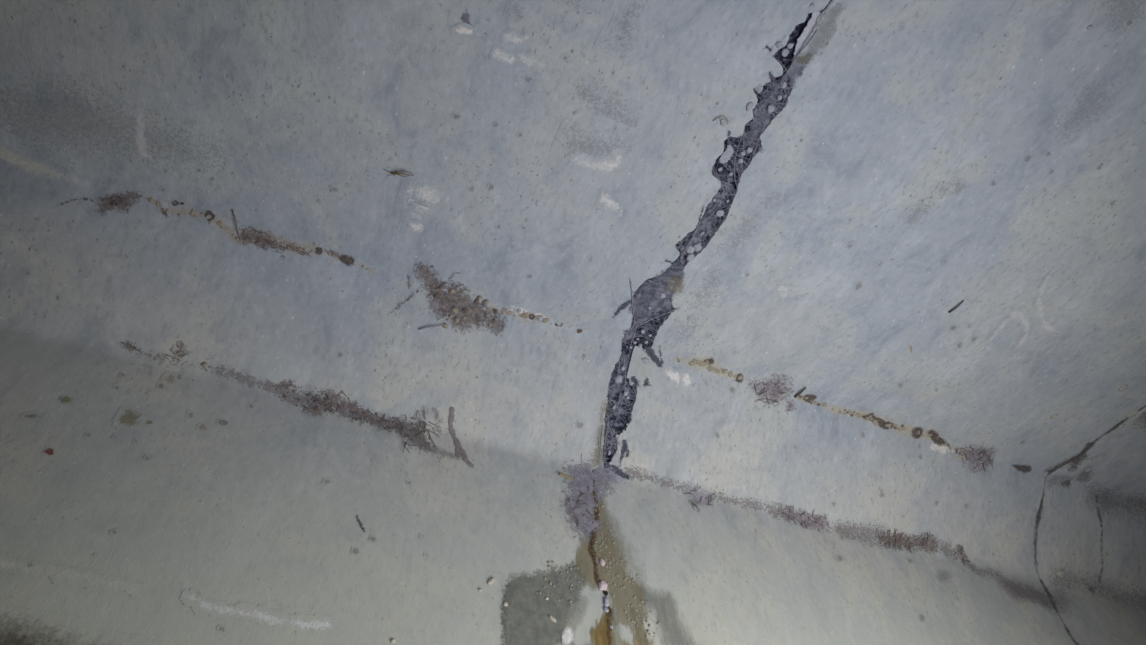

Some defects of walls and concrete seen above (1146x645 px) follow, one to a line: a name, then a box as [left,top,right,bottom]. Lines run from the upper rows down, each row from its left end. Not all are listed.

water stain [0,595,142,645]
water stain [179,588,335,636]
water stain [501,561,586,645]
crack [588,480,613,645]
rust [576,525,652,645]
water stain [562,460,689,645]
crack [1088,495,1104,592]